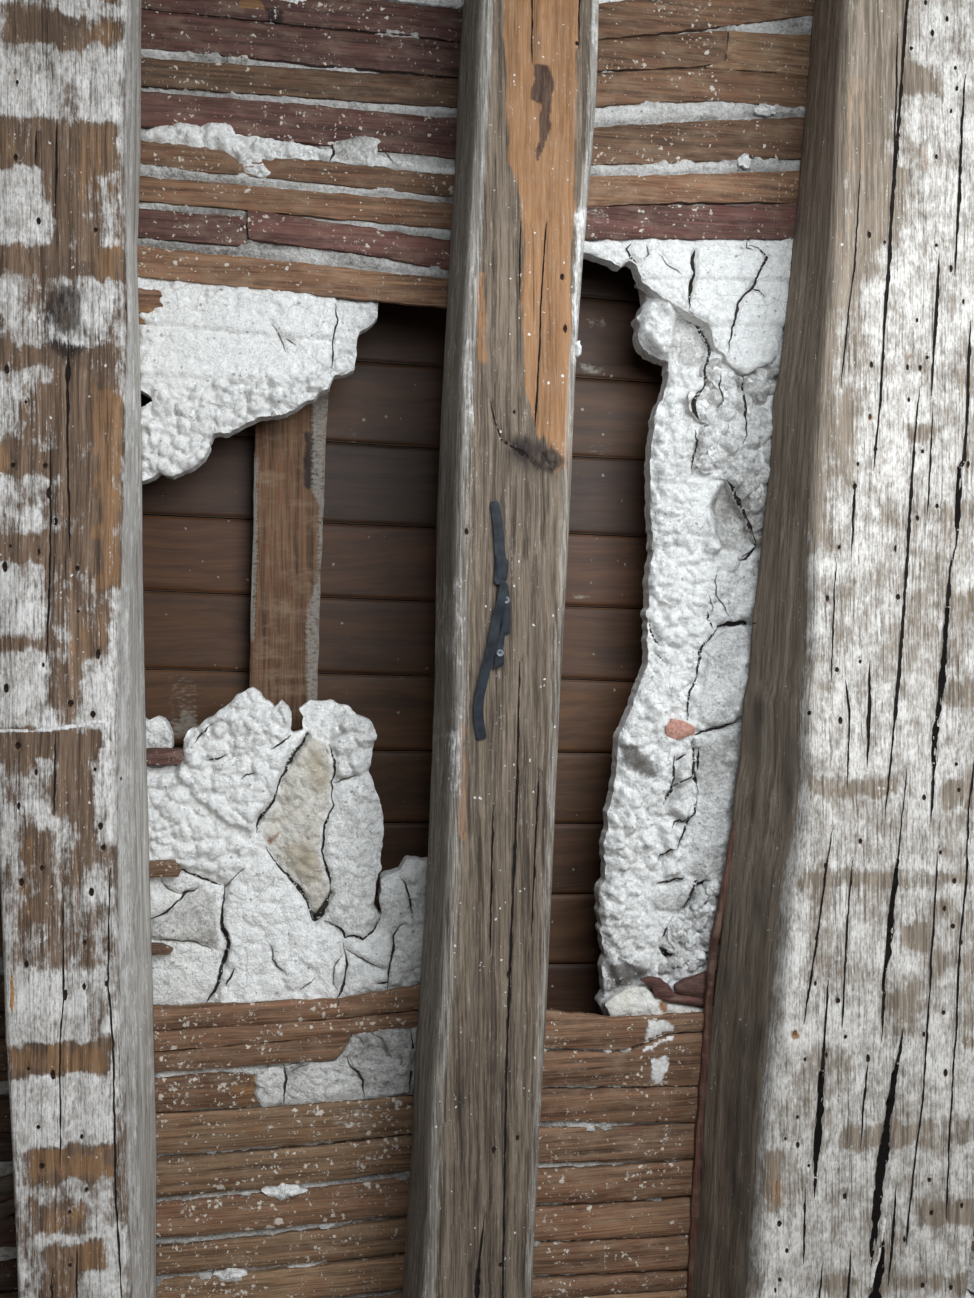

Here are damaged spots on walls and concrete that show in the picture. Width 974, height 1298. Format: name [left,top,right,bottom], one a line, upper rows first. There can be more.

crack [528,0,536,63]
crack [575,0,583,46]
crack [626,241,768,467]
crack [803,0,974,1298]
spalling [665,719,696,740]
crack [649,480,756,957]
crack [151,723,413,1005]
spalling [657,878,721,975]
peeling [603,985,704,1017]